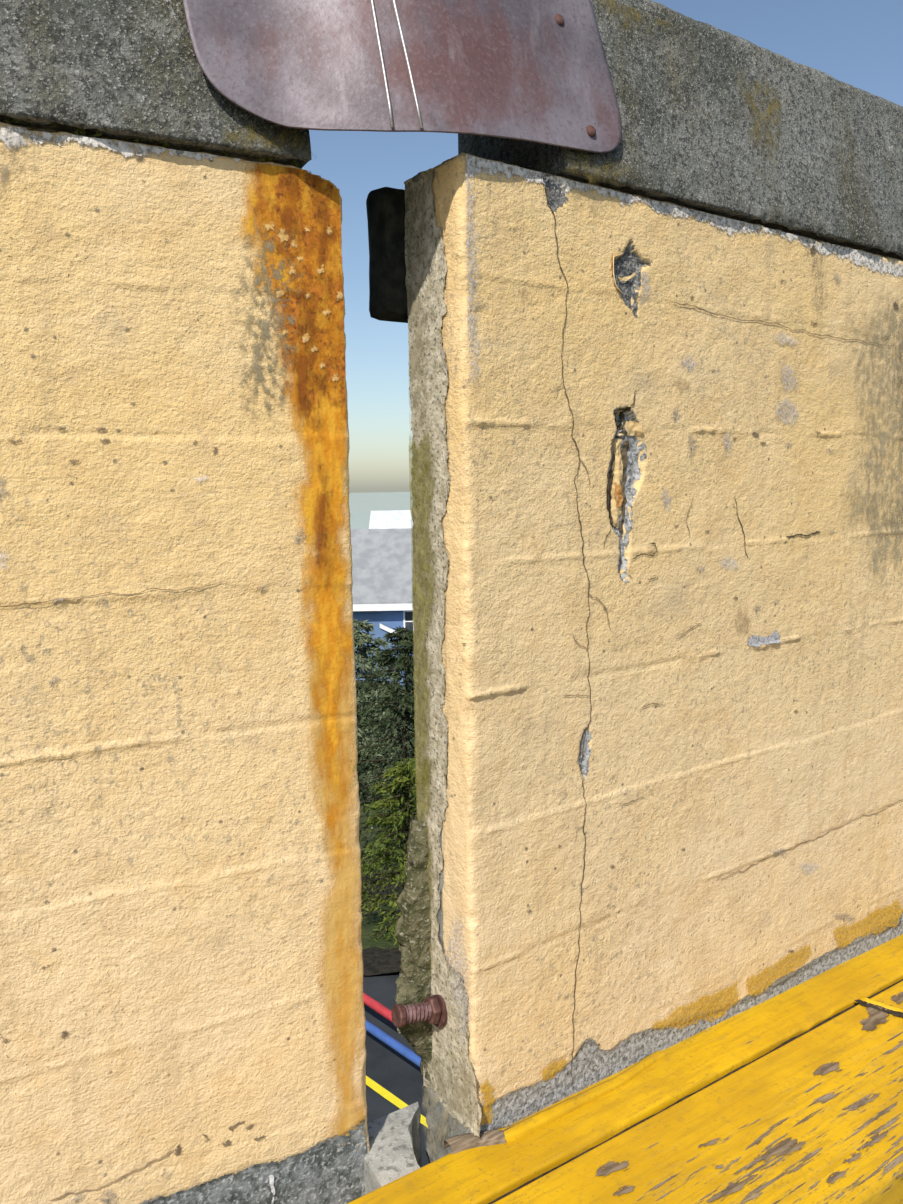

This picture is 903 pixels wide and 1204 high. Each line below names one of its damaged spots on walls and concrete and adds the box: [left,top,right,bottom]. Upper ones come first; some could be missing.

crack [49,1150,174,1201]
rust [242,163,363,1145]
crack [541,172,611,1083]
peeling [394,155,903,1137]
crack [718,800,902,880]
damp [854,309,903,576]